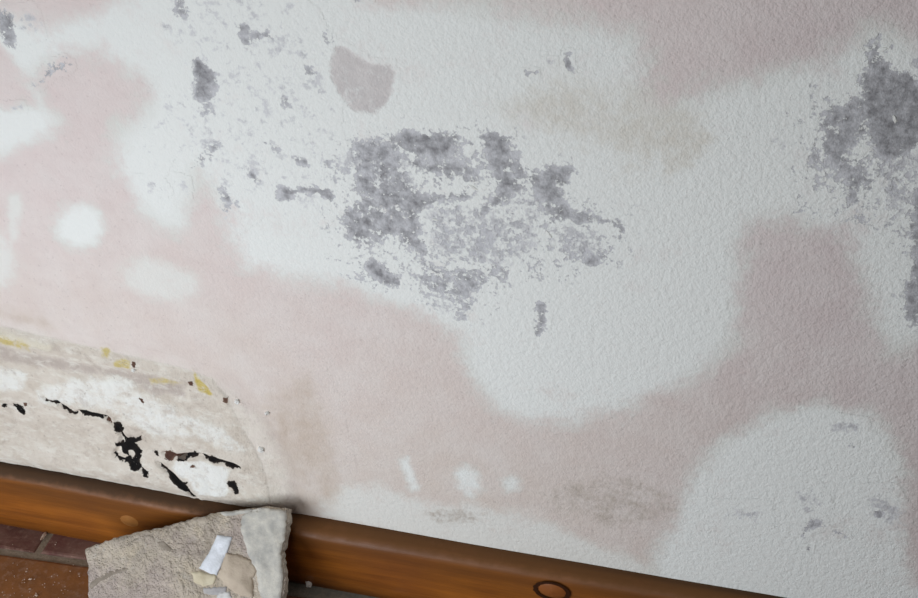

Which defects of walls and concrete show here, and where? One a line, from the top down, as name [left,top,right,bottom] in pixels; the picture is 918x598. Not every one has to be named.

crack [2,398,241,497]